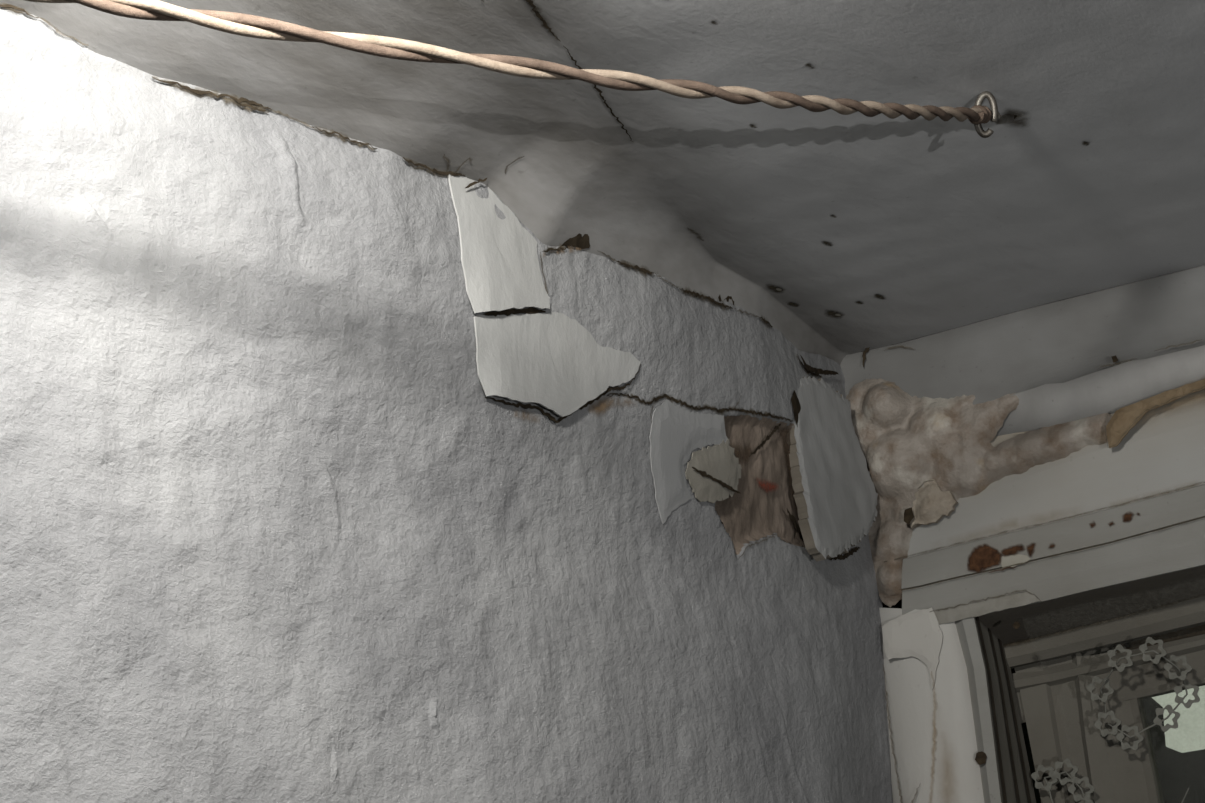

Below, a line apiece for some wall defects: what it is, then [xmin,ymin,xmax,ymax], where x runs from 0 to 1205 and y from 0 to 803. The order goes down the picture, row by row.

crack [0,4,87,45]
crack [525,0,633,142]
crack [152,76,524,188]
peeling [448,174,641,423]
crack [544,233,773,328]
crack [608,393,793,423]
crack [796,346,912,378]
spalling [649,400,805,558]
corrosion [968,543,1055,573]